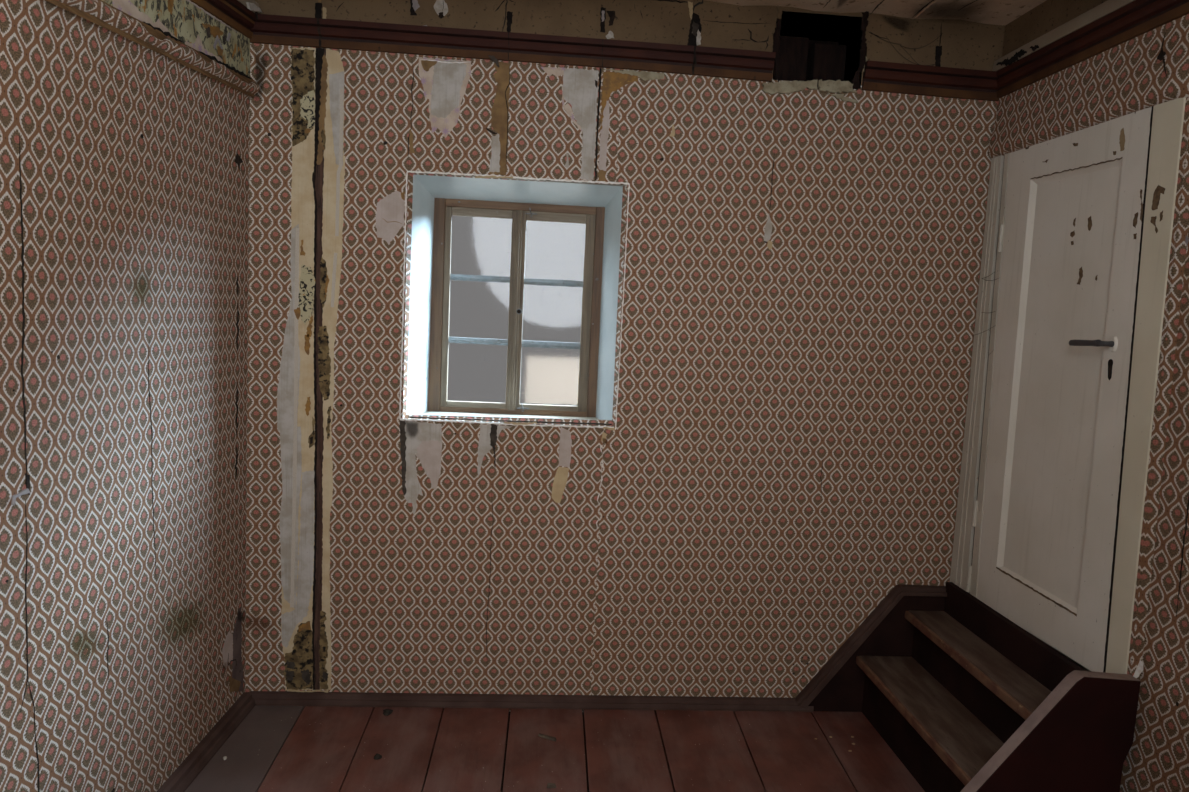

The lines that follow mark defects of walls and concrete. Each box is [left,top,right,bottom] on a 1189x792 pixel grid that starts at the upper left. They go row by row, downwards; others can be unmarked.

peeling [421,60,437,71]
crack [496,0,514,60]
crack [600,0,772,74]
spalling [762,5,869,103]
peeling [1133,185,1165,239]
crack [11,136,40,792]